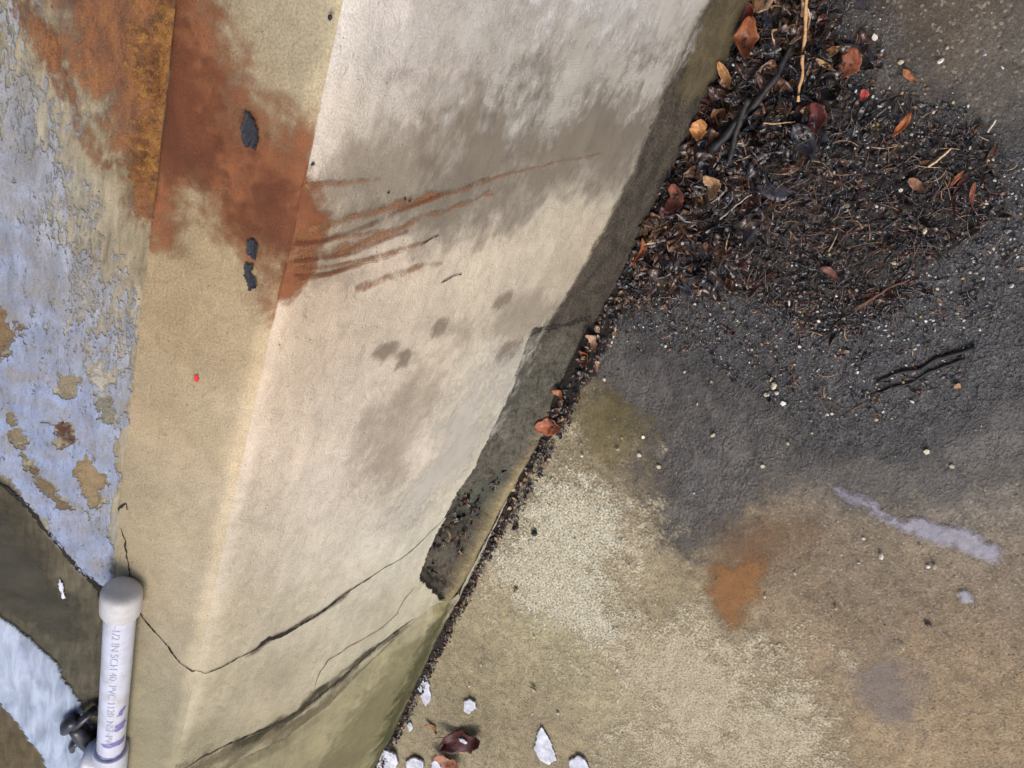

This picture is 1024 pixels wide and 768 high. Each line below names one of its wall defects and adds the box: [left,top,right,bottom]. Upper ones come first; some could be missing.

rust [18,0,551,319]
peeling [0,305,25,359]
peeling [6,408,106,513]
peeling [57,360,117,428]
damp [375,343,410,367]
damp [390,339,530,526]
damp [471,0,1024,768]
crack [118,503,131,577]
crack [140,517,446,674]